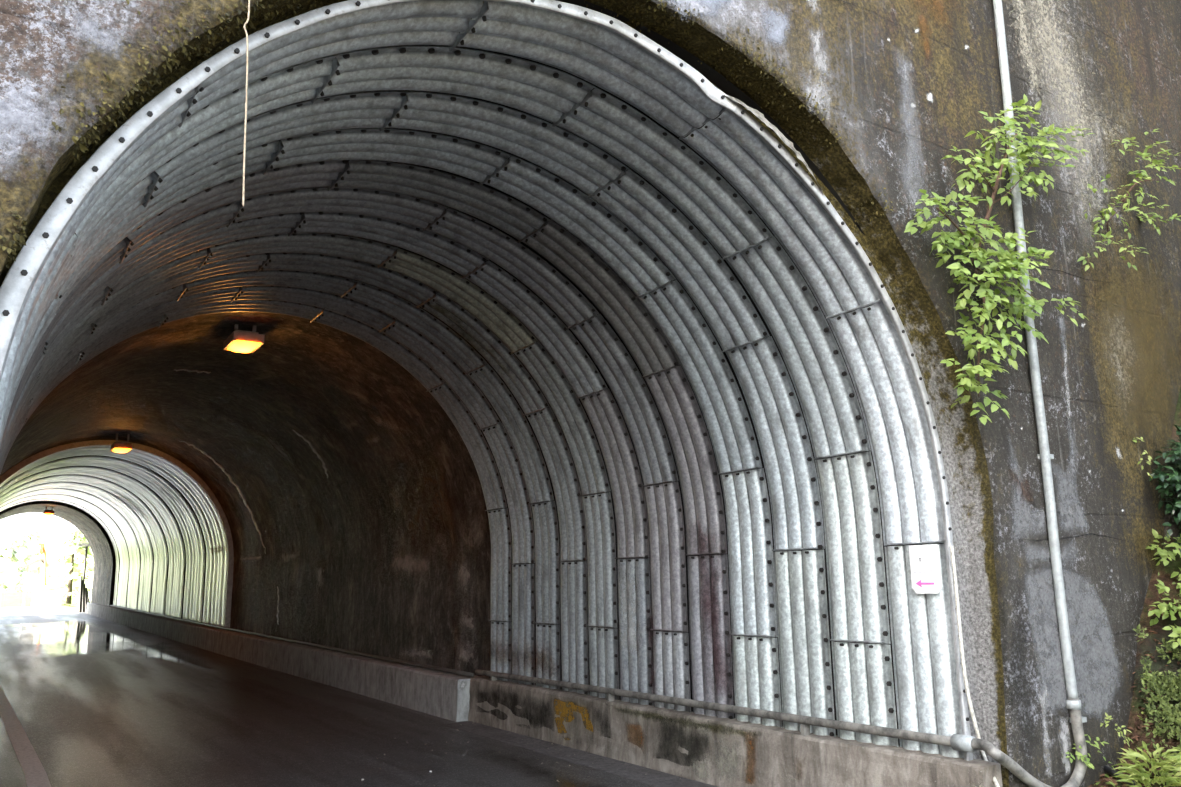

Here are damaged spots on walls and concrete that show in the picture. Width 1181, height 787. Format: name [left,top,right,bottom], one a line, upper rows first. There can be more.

leakage [1059,316,1070,415]
leakage [1010,430,1120,775]